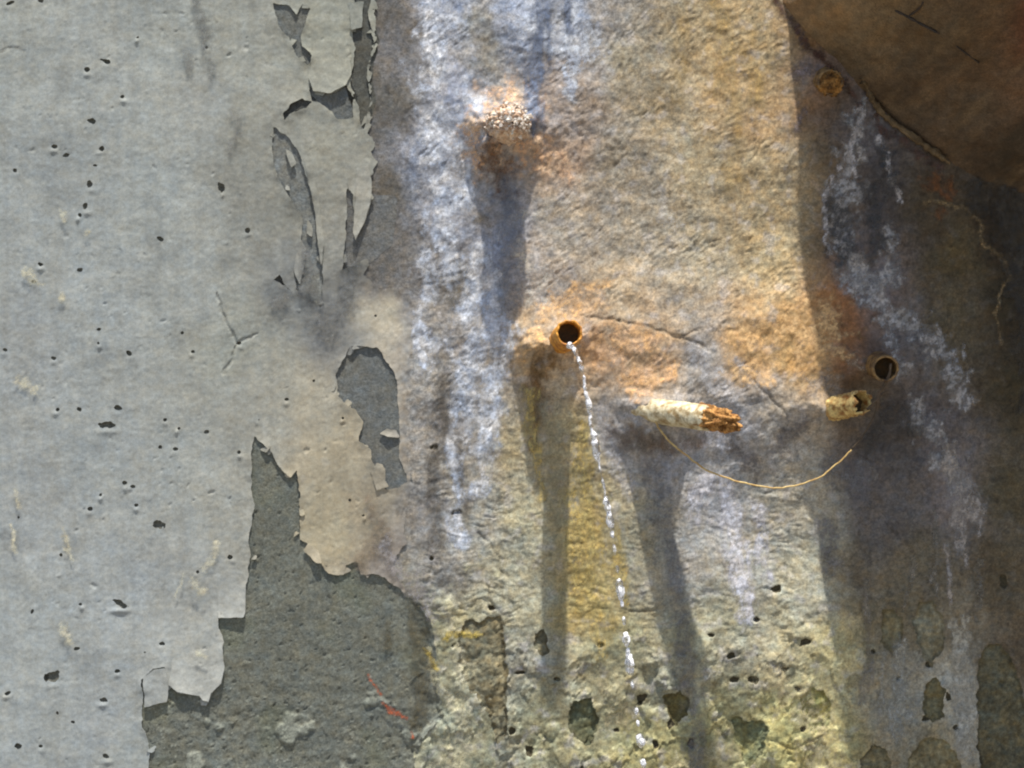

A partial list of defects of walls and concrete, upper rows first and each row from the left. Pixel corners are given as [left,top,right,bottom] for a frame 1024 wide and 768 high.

peeling [141,437,444,768]
peeling [270,0,379,307]
peeling [342,165,398,270]
peeling [331,343,413,490]
leakage [411,0,570,554]
rust [457,81,573,199]
rust [588,321,679,403]
leakage [774,0,974,412]
leakage [902,396,986,605]